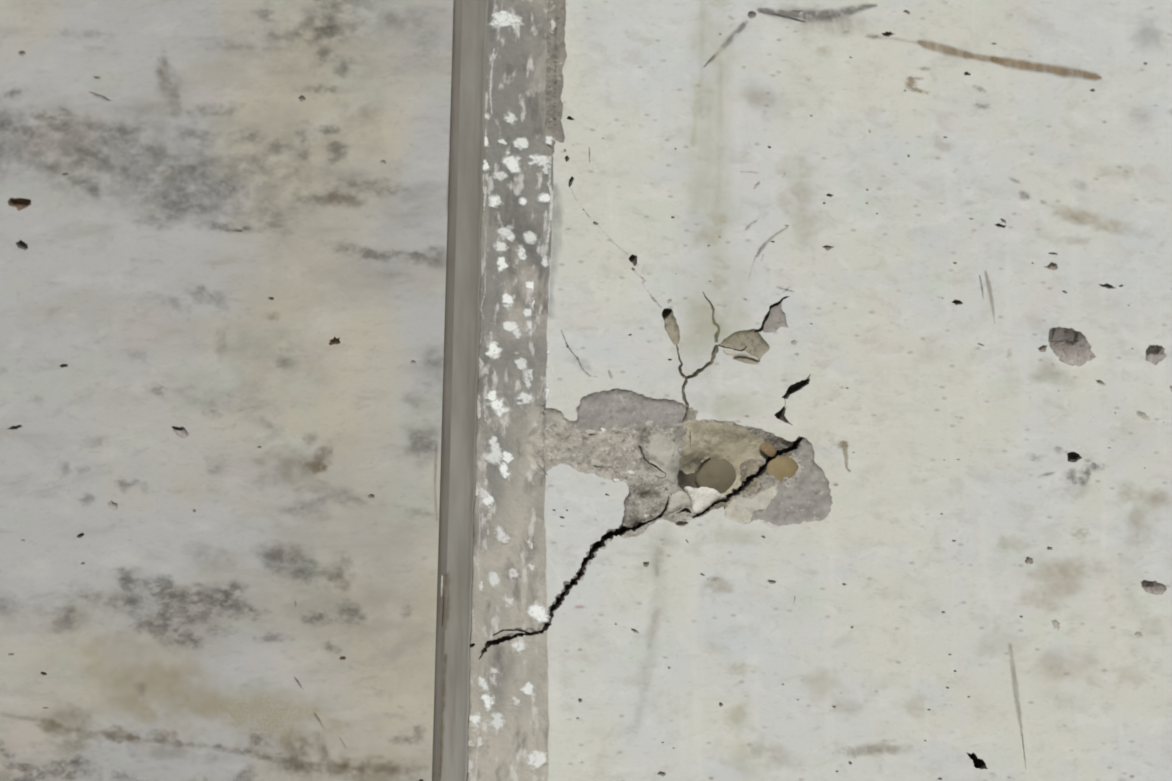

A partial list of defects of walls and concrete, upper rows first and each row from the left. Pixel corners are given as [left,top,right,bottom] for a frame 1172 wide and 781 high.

rust [920,41,1101,79]
crack [662,292,789,447]
spalling [1038,327,1096,367]
crack [470,374,811,659]
spalling [525,370,833,538]